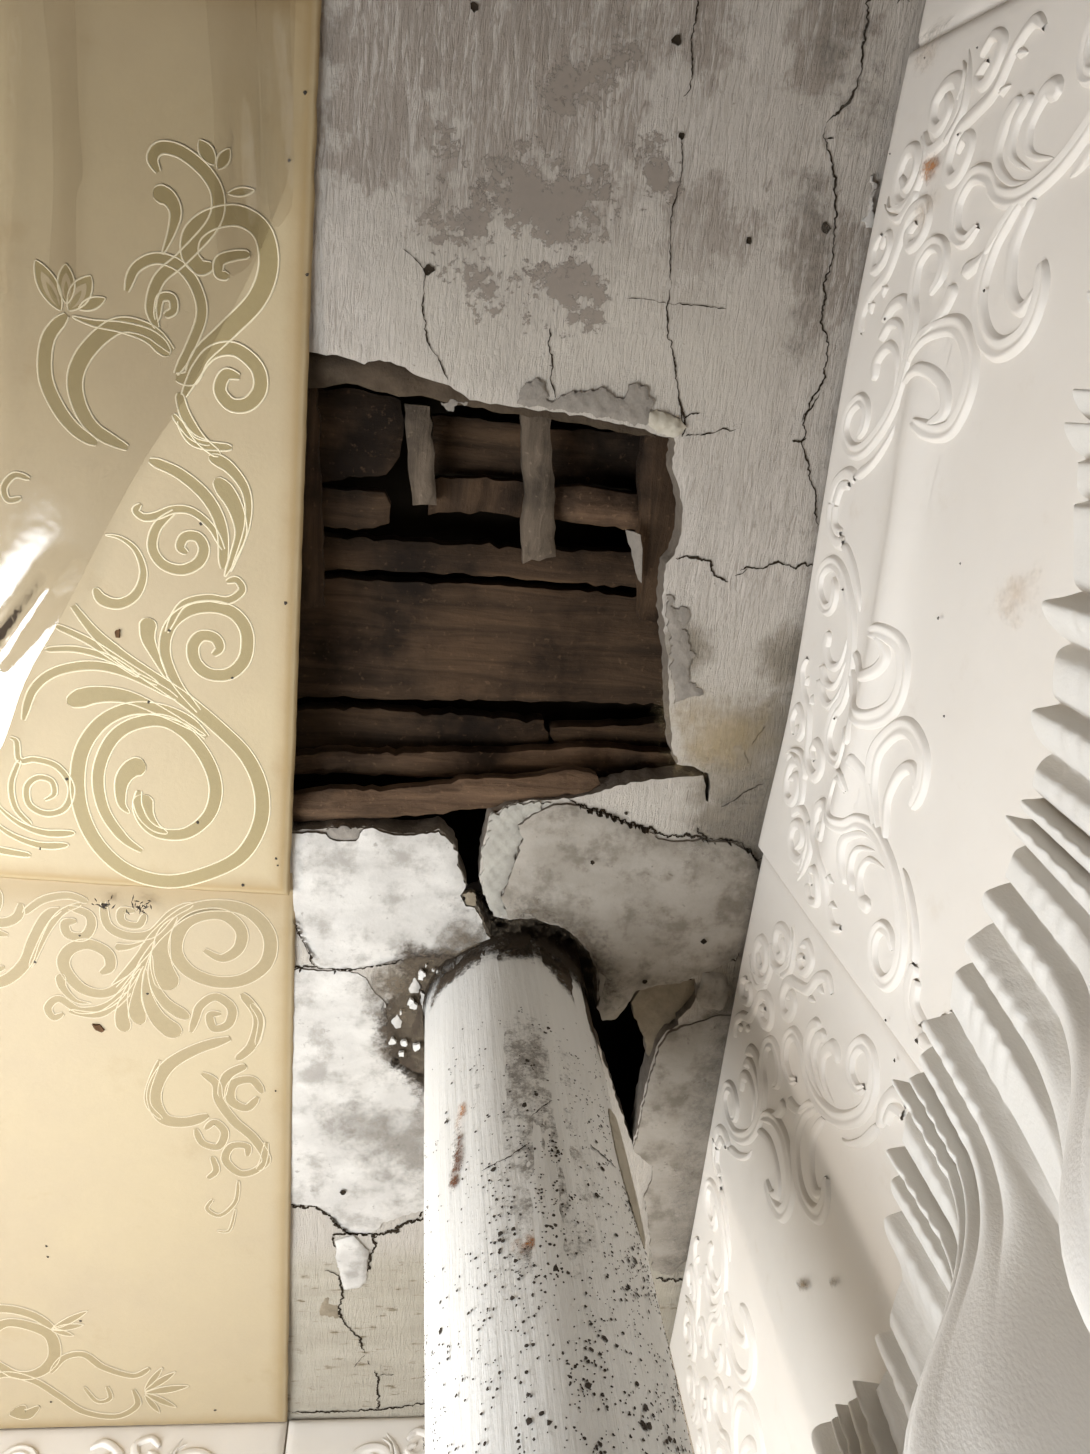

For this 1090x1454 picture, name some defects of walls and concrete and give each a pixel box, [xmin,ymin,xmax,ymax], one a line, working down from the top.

crack [684,0,699,96]
crack [629,140,734,437]
crack [792,0,910,525]
spalling [441,399,469,412]
flaking render [648,409,686,437]
crack [676,555,813,582]
spalling [326,823,364,841]
spalling [461,800,551,917]
crack [569,726,766,862]
flaking render [388,963,441,1057]
damp [366,890,694,1454]
crack [291,1204,425,1413]